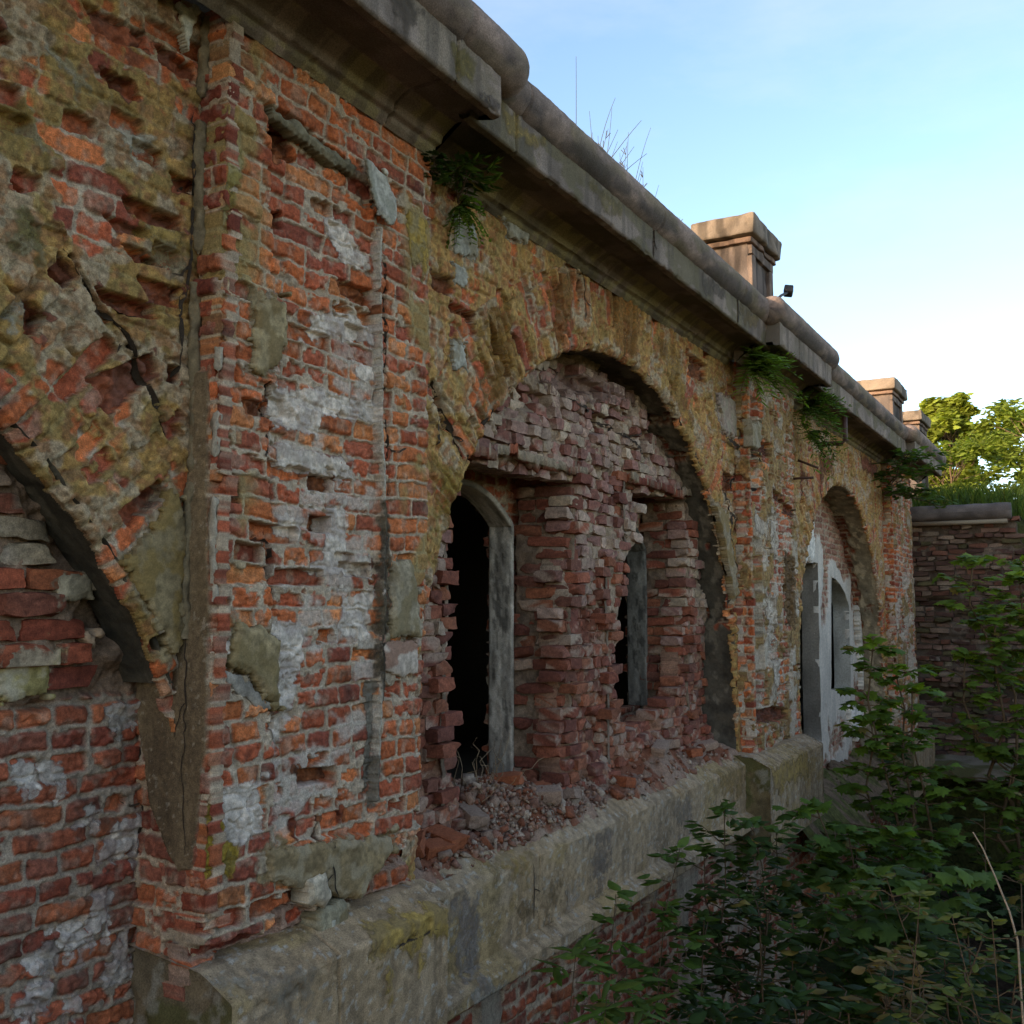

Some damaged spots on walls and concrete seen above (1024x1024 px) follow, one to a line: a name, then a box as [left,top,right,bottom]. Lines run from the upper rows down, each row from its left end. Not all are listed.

peeling [264,107,397,226]
crack [63,112,196,437]
peeling [298,216,384,349]
damp [477,294,522,427]
peeling [241,382,383,492]
peeling [250,496,420,678]
damp [362,500,392,809]
damp [10,758,68,805]
damp [71,804,142,870]
crack [174,639,187,850]
peeling [222,772,270,846]
damp [12,886,136,1024]